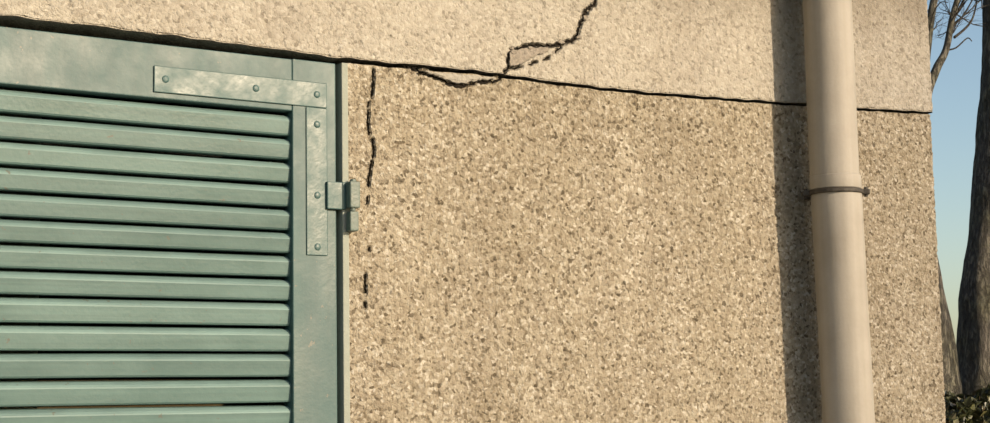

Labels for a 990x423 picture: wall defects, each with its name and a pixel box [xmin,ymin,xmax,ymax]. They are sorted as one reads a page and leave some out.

crack [402,0,597,88]
flaking render [508,47,548,66]
crack [366,70,375,205]
crack [363,247,371,308]